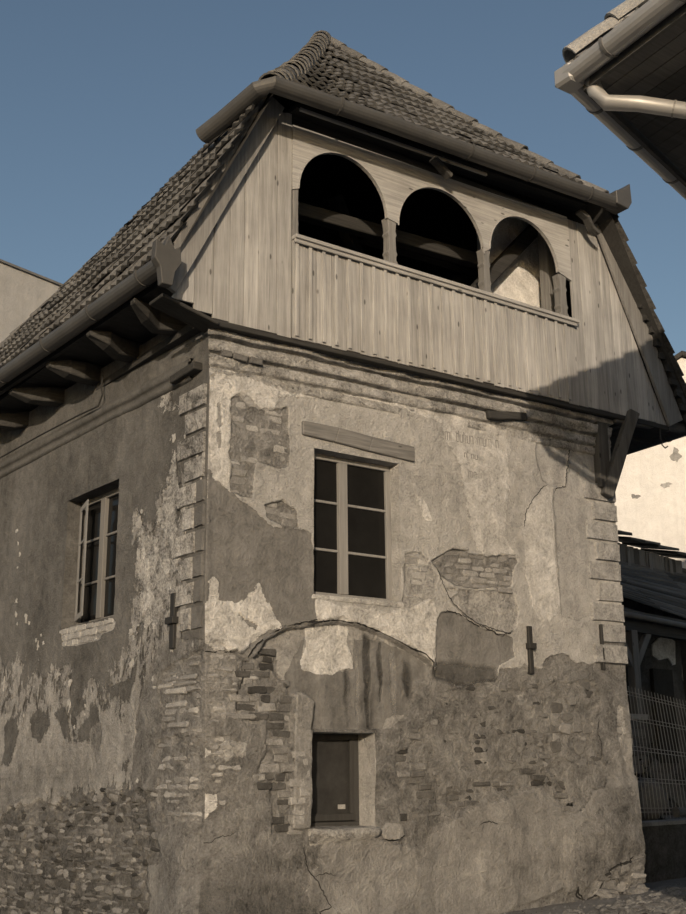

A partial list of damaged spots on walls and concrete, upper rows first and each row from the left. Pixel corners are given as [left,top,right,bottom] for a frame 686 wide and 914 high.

peeling [158,391,179,413]
flaking render [669,447,682,462]
crack [524,441,572,619]
spalling [0,396,647,914]
crack [304,845,334,914]